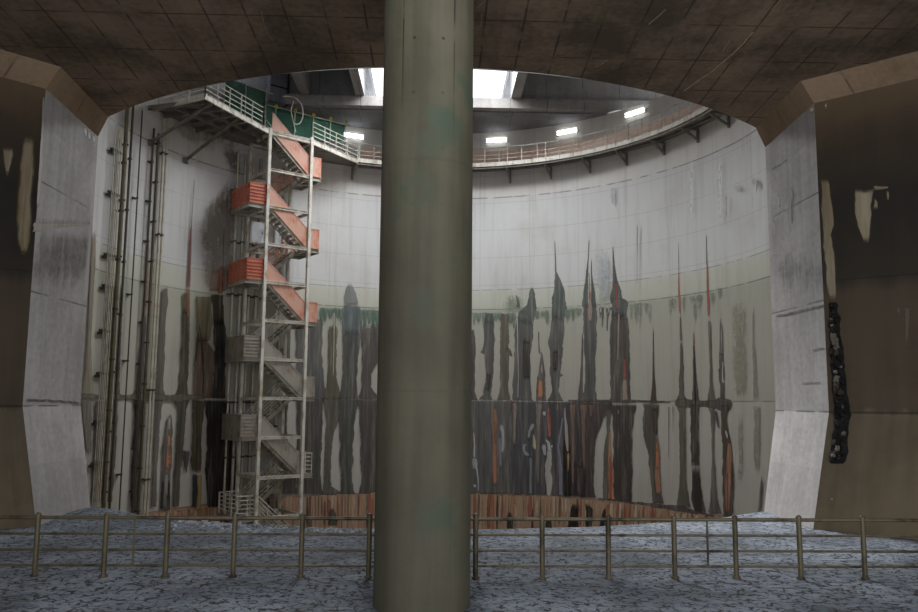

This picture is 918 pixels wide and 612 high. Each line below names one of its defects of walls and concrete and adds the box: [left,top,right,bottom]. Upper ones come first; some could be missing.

damp [39,188,236,510]
damp [282,285,378,494]
damp [471,243,760,517]
spalling [821,181,851,464]
peeling [855,186,889,240]